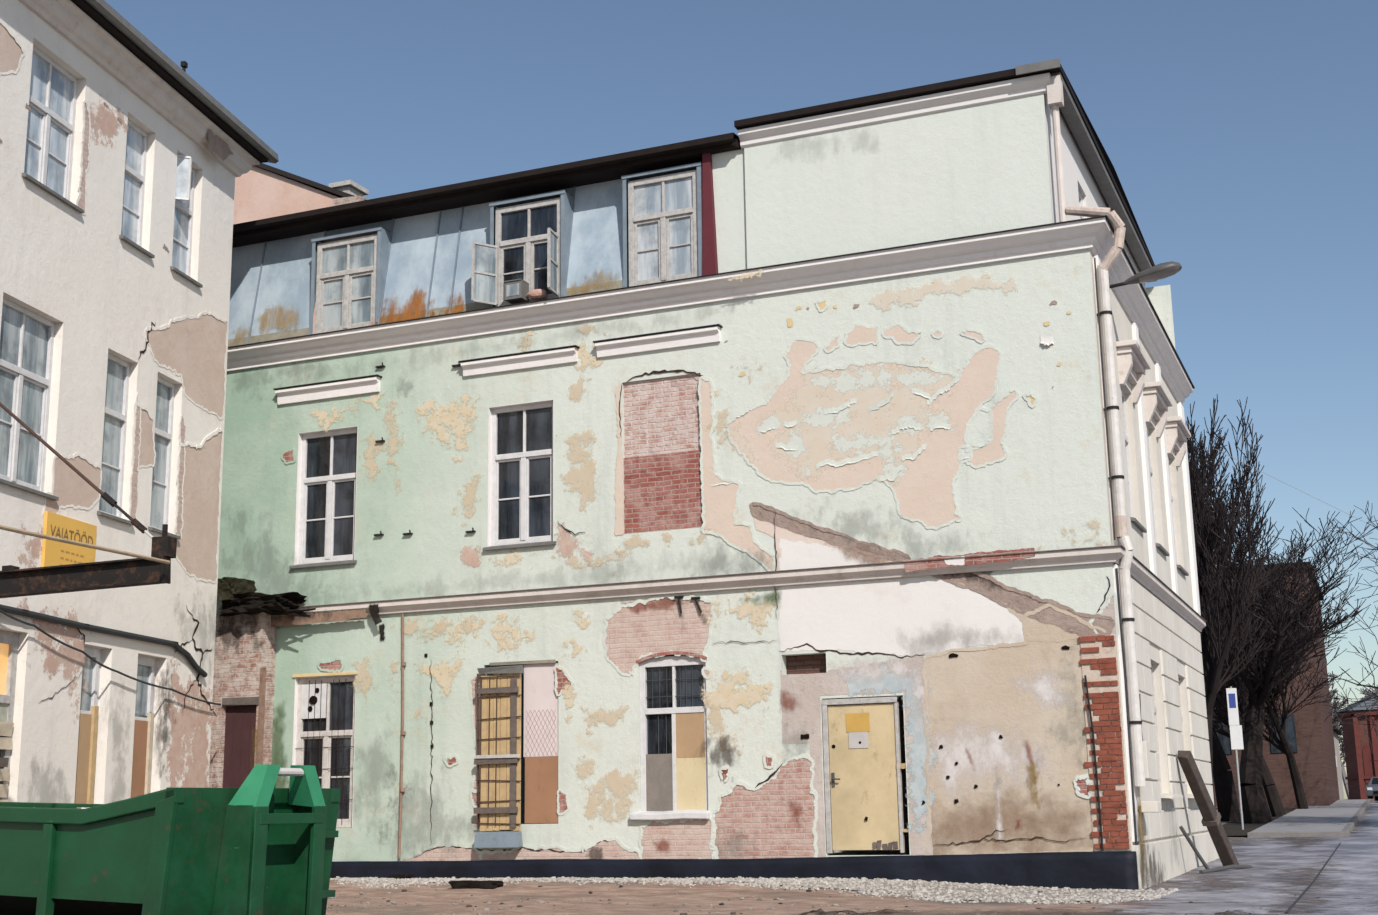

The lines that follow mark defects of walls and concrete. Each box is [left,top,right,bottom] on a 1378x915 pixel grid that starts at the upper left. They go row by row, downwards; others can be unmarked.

peeling [0,19,24,76]
crack [139,321,156,358]
corrosion [376,291,464,324]
peeling [129,392,156,519]
peeling [145,311,228,583]
peeling [553,381,671,568]
peeling [689,273,1054,571]
peeling [17,598,88,706]
crack [175,605,217,717]
crack [414,654,636,858]
flaking render [400,572,1119,861]
crack [714,513,920,658]